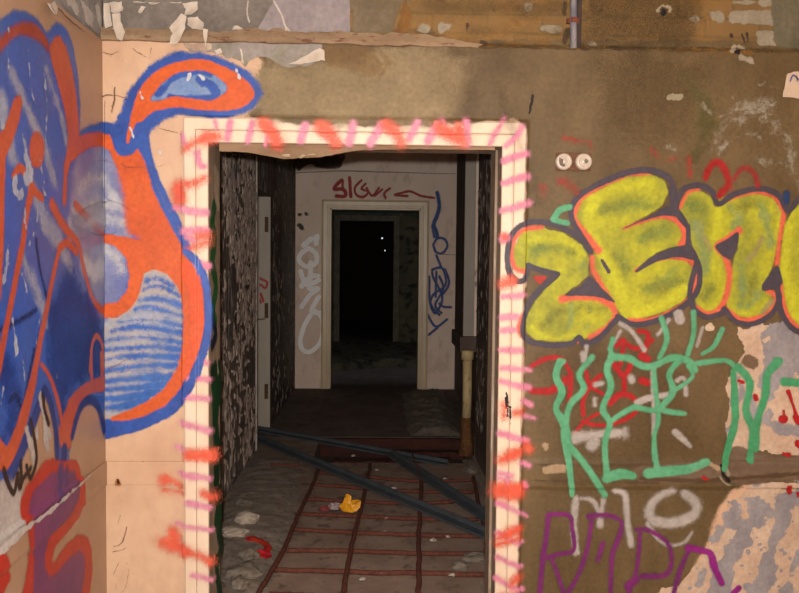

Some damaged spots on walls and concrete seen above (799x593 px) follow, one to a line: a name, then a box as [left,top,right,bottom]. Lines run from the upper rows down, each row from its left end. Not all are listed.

peeling [169,2,325,79]
peeling [417,22,452,34]
peeling [540,25,562,34]
peeling [709,0,799,64]
leakage [243,32,799,593]
peeling [725,320,799,456]
peeling [659,480,799,593]